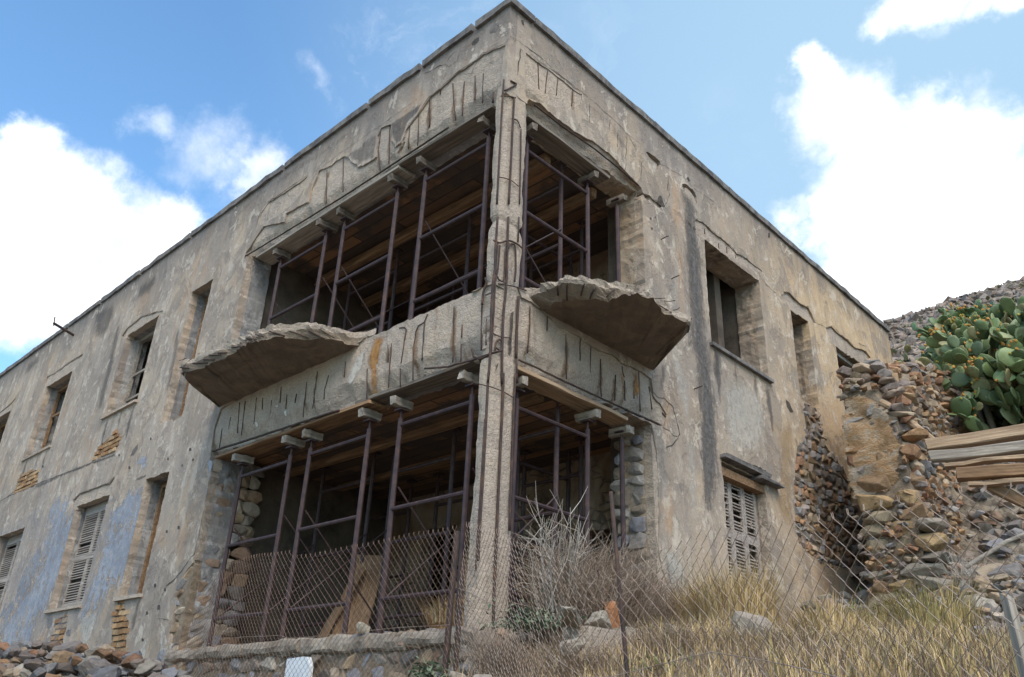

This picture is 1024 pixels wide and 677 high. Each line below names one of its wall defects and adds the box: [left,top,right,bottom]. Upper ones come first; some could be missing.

spalling [179,329,335,376]
corrosion [370,338,383,394]
spalling [204,47,666,627]
water stain [682,192,721,507]
spalling [13,465,44,495]
spalling [91,429,122,461]
spalling [786,400,865,571]
peeling [0,480,143,652]
spalling [154,560,202,648]